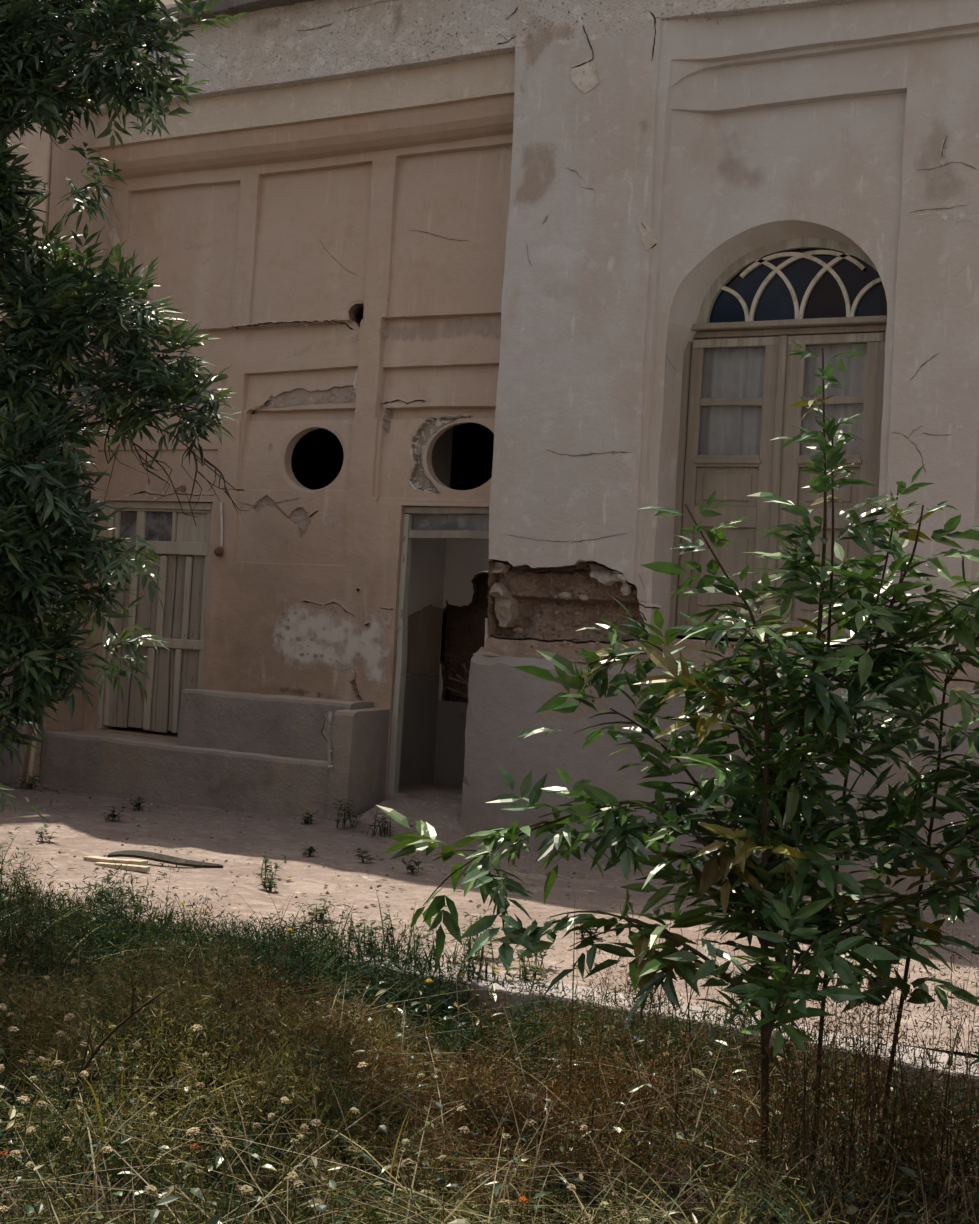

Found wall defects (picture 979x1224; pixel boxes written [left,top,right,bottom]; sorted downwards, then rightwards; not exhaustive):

crack [648,9,677,62]
crack [919,132,976,170]
flaking render [248,369,358,414]
flaking render [408,414,472,495]
crack [545,449,631,457]
flaking render [235,496,318,536]
flaking render [443,559,645,652]
flaking render [273,599,394,700]